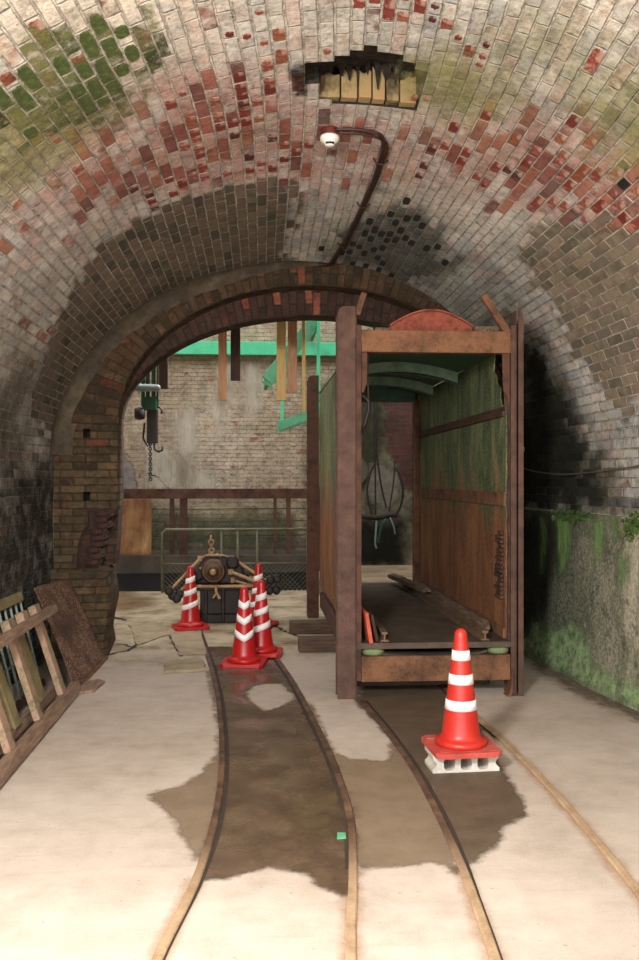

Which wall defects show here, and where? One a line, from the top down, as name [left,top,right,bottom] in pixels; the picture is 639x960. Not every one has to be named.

peeling [165,91,187,110]
spalling [209,28,430,140]
water stain [491,355,502,376]
water stain [524,339,639,634]
crack [109,644,137,655]
water stain [149,646,526,895]